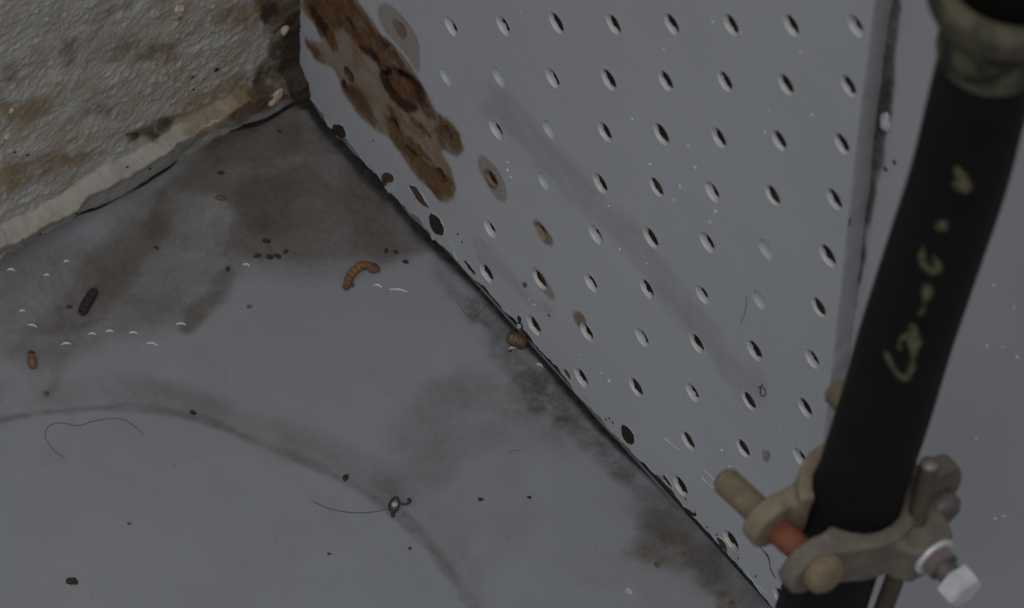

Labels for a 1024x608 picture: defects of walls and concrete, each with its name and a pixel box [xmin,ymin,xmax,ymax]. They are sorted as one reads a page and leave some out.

damp [130,119,172,139]
corrosion [301,0,461,201]